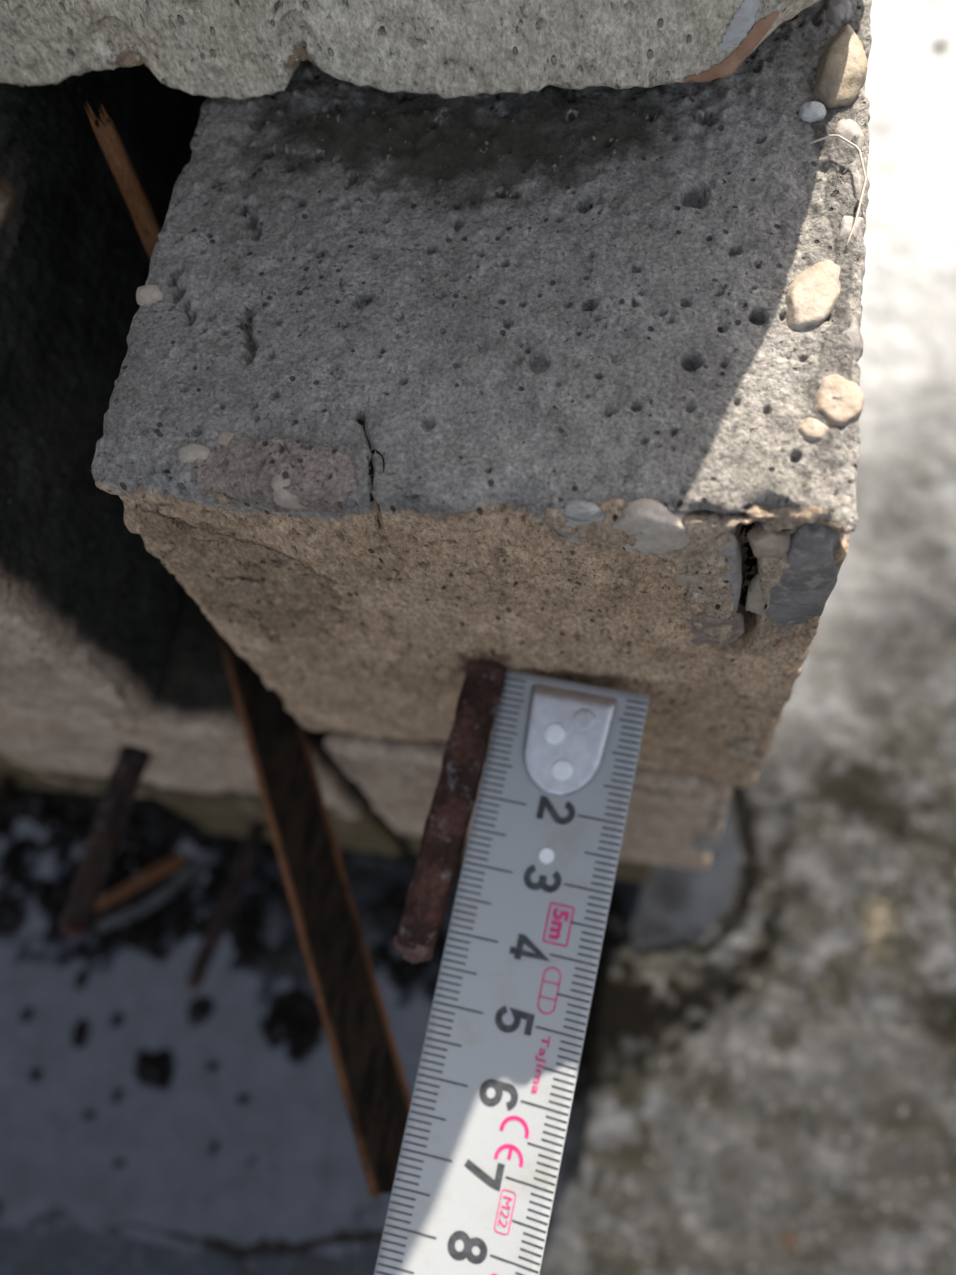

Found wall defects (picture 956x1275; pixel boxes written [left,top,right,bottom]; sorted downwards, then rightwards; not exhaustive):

crack [362,421,385,528]
spalling [543,498,850,656]